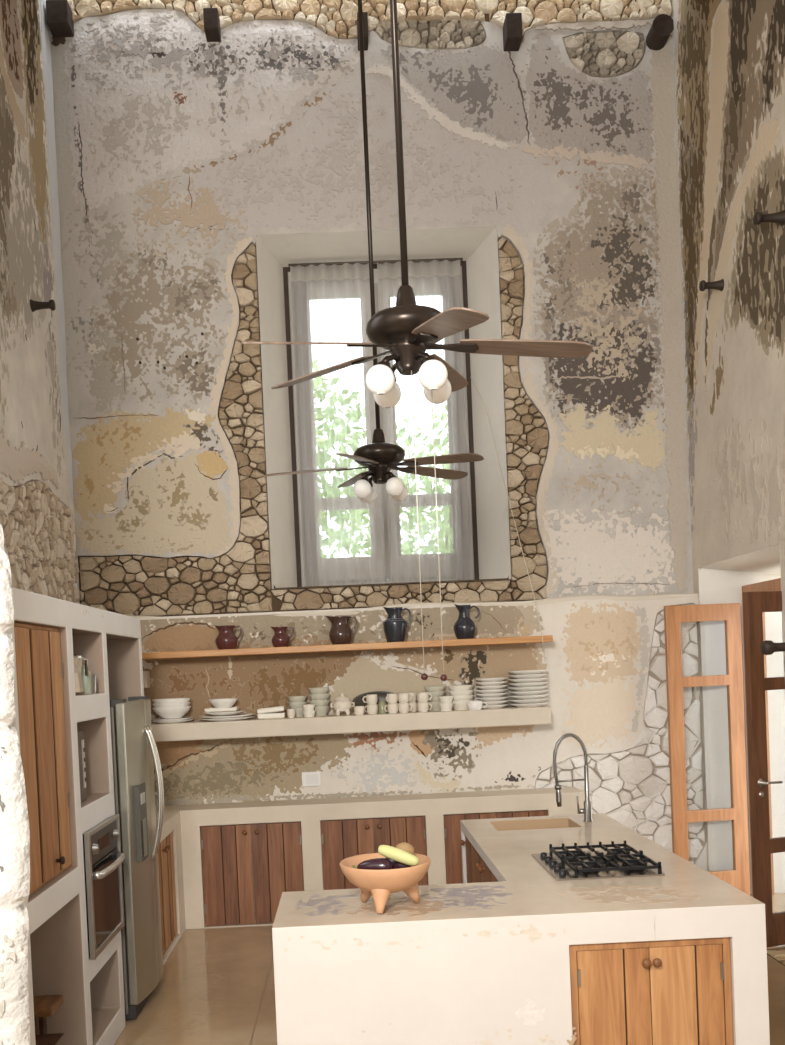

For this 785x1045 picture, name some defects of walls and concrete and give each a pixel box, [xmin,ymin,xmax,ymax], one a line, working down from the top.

flaking render [51,33,66,46]
flaking render [67,0,672,78]
crack [508,51,530,143]
water stain [0,0,529,553]
water stain [385,36,668,514]
flaking render [0,237,549,617]
water stain [708,408,785,567]
peeling [154,743,231,781]
flaking render [408,730,435,757]